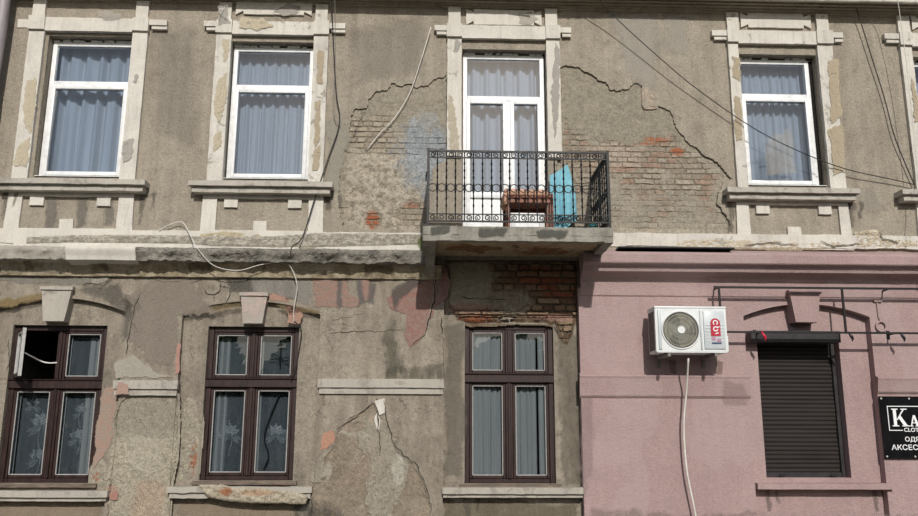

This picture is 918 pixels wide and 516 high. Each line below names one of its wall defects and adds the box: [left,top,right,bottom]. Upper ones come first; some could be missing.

peeling [13,77,37,167]
flaking render [338,76,459,230]
flaking render [550,44,842,251]
peeling [827,58,845,176]
crack [125,278,230,354]
flaking render [387,260,579,347]
flaking render [93,277,214,516]
crack [337,402,432,516]